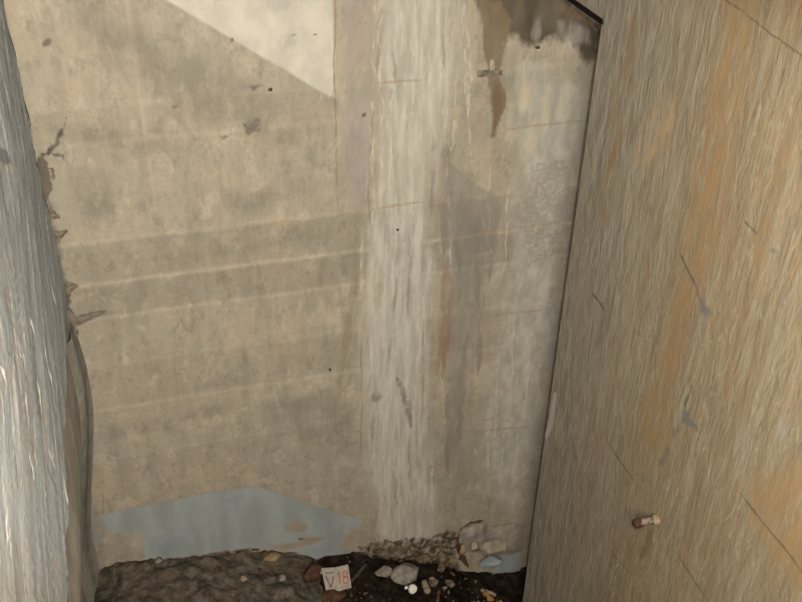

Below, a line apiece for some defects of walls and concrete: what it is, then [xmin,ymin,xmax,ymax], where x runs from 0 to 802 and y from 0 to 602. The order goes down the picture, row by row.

spalling [477,60,503,77]
spalling [52,230,68,244]
water stain [367,0,450,547]
spalling [66,307,106,330]